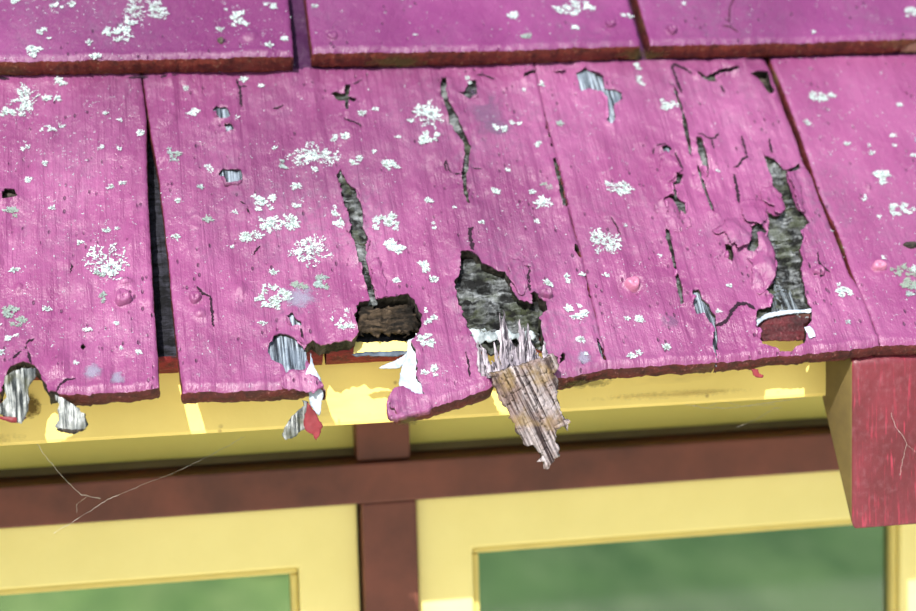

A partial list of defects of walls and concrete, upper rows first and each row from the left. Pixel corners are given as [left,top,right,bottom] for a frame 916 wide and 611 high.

peeling [576,69,621,123]
crack [444,160,481,175]
peeling [787,171,806,213]
peeling [508,258,529,296]
peeling [712,186,816,341]
peeling [689,289,720,366]
peeling [0,368,36,424]
peeling [55,395,88,434]
peeling [268,334,323,440]
peeling [379,338,432,422]